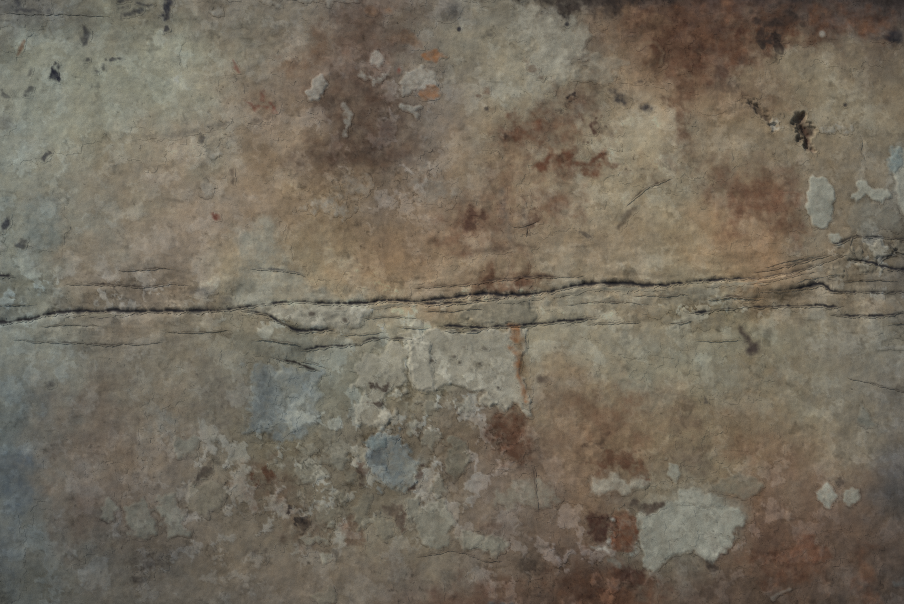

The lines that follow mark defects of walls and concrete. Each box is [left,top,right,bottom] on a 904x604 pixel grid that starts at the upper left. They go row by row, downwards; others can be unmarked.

damp [47,60,63,84]
damp [79,23,123,75]
damp [0,214,12,234]
corrosion [195,0,901,327]
crack [0,234,904,372]
damp [0,439,43,604]
damp [134,345,305,503]
corrosion [225,446,372,556]
peeling [292,318,462,507]
peeling [375,463,450,535]
peeling [452,474,565,563]
corrosion [366,319,785,604]